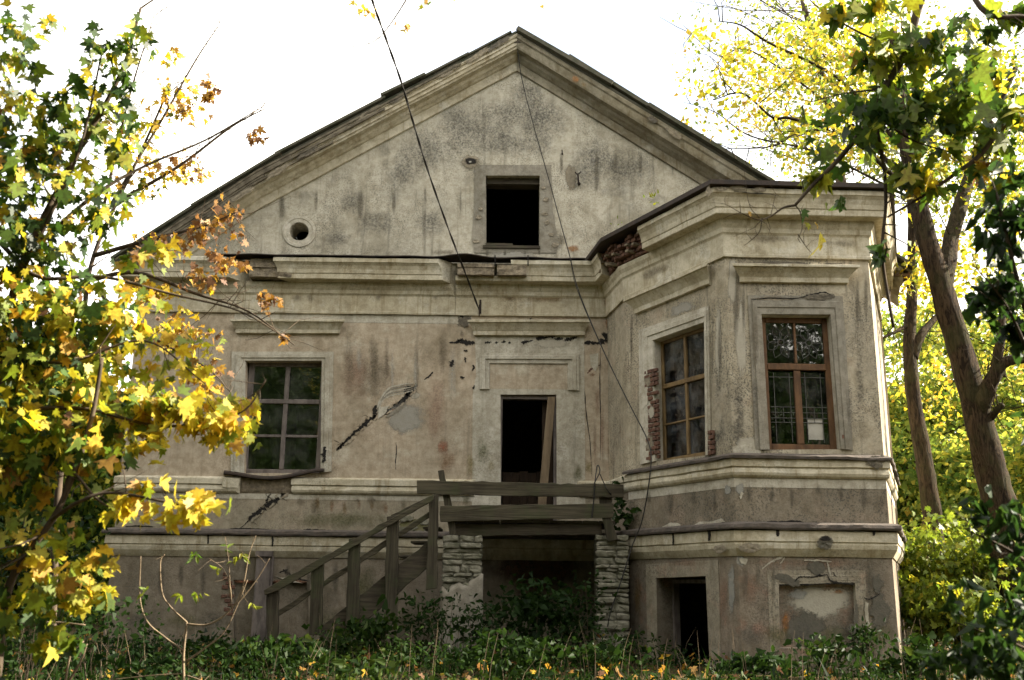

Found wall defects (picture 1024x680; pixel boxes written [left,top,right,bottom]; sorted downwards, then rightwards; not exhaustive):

flaking render [599,231,649,276]
spalling [449,316,608,389]
crack [320,372,433,463]
flaking render [377,383,423,433]
flaking render [639,368,661,460]
flaking render [708,430,719,456]
flaking render [732,437,761,453]
crack [230,493,289,529]
flaking render [762,556,854,646]